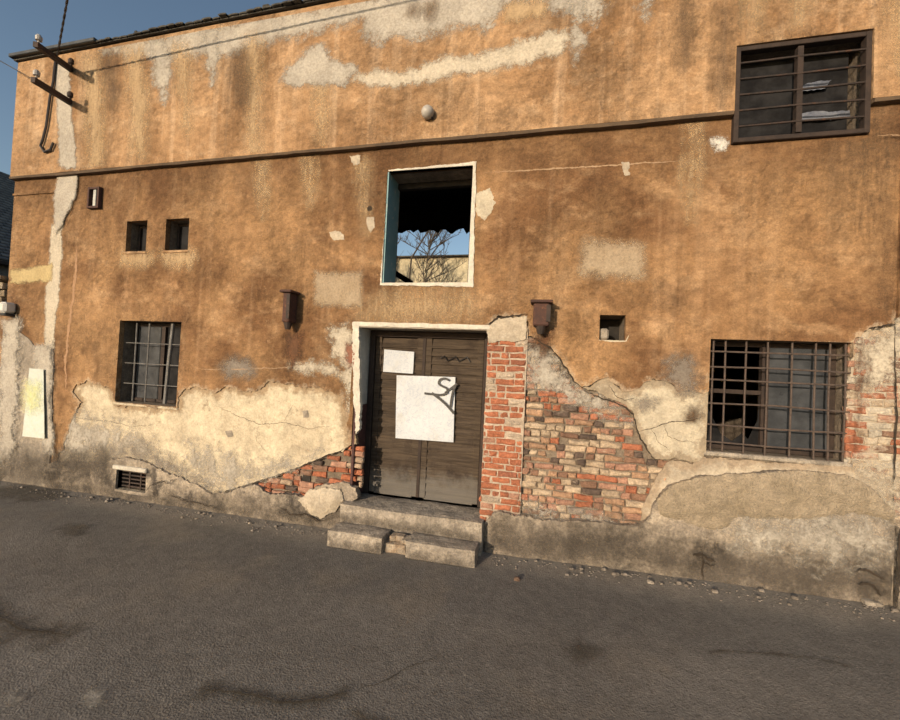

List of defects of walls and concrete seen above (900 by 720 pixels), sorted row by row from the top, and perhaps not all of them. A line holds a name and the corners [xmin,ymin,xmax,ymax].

flaking render [98,0,605,105]
flaking render [475,188,496,221]
damp [0,414,325,517]
flaking render [59,323,365,496]
flaking render [479,315,900,528]
crack [869,323,898,505]
damp [487,514,897,600]
crack [892,534,900,608]